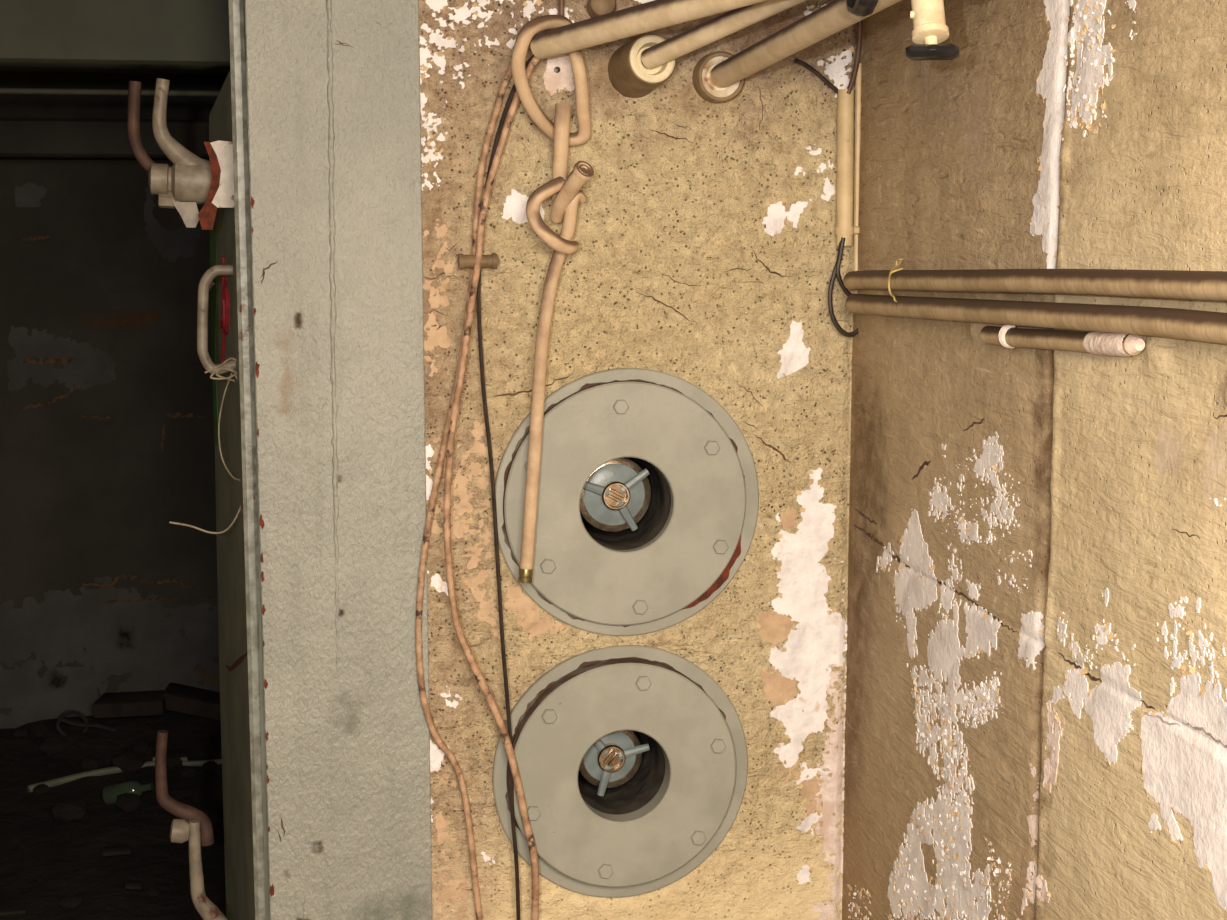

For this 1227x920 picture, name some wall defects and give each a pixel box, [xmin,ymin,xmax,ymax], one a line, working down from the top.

peeling [419,0,575,190]
peeling [817,45,856,98]
peeling [1030,0,1116,269]
peeling [1125,0,1137,40]
crack [854,508,1017,632]
crack [1044,478,1052,616]
peeling [757,432,1227,920]
crack [1034,652,1102,915]
crack [1140,700,1227,748]